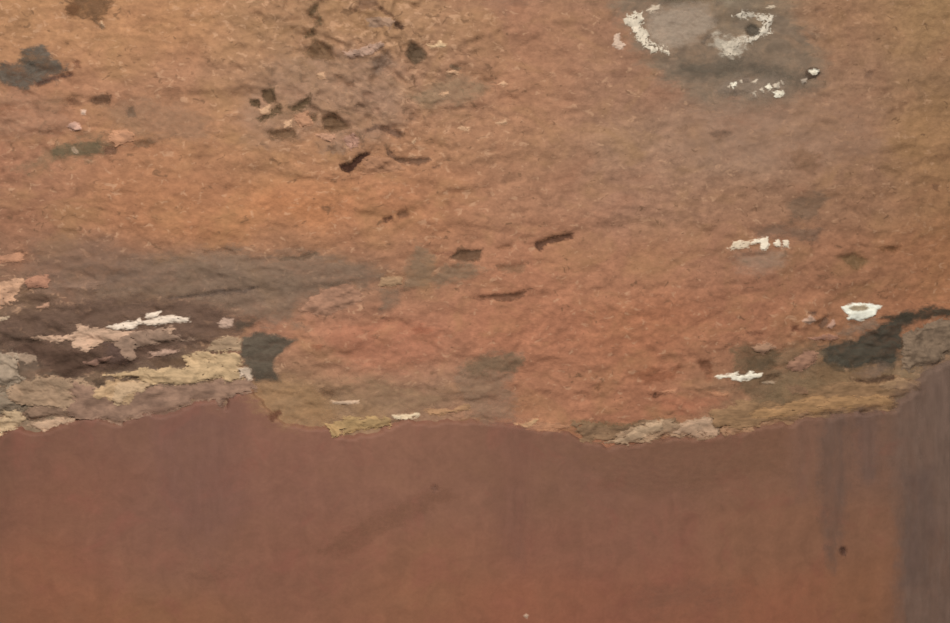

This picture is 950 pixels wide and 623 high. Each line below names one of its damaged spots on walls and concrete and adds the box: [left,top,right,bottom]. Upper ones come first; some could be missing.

mould [0,44,67,89]
damp [613,0,820,105]
flaking render [0,0,950,448]
damp [819,306,950,376]